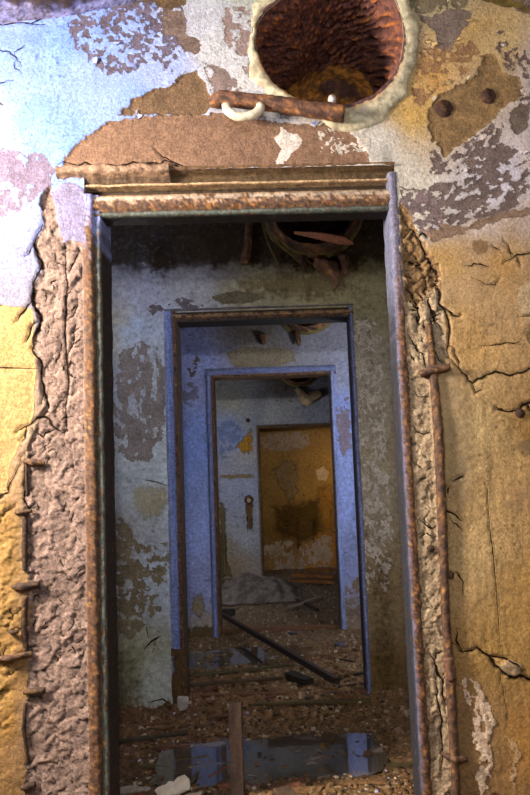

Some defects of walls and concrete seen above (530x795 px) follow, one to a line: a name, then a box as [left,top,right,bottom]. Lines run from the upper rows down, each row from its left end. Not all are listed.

crack [0,224,84,559]
flaking render [0,0,372,795]
flaking render [398,0,530,795]
crack [402,216,530,393]
crack [496,401,530,412]
damp [264,499,333,570]
crack [0,595,84,692]
crack [428,479,530,770]
damp [461,678,496,795]
damp [506,736,521,794]